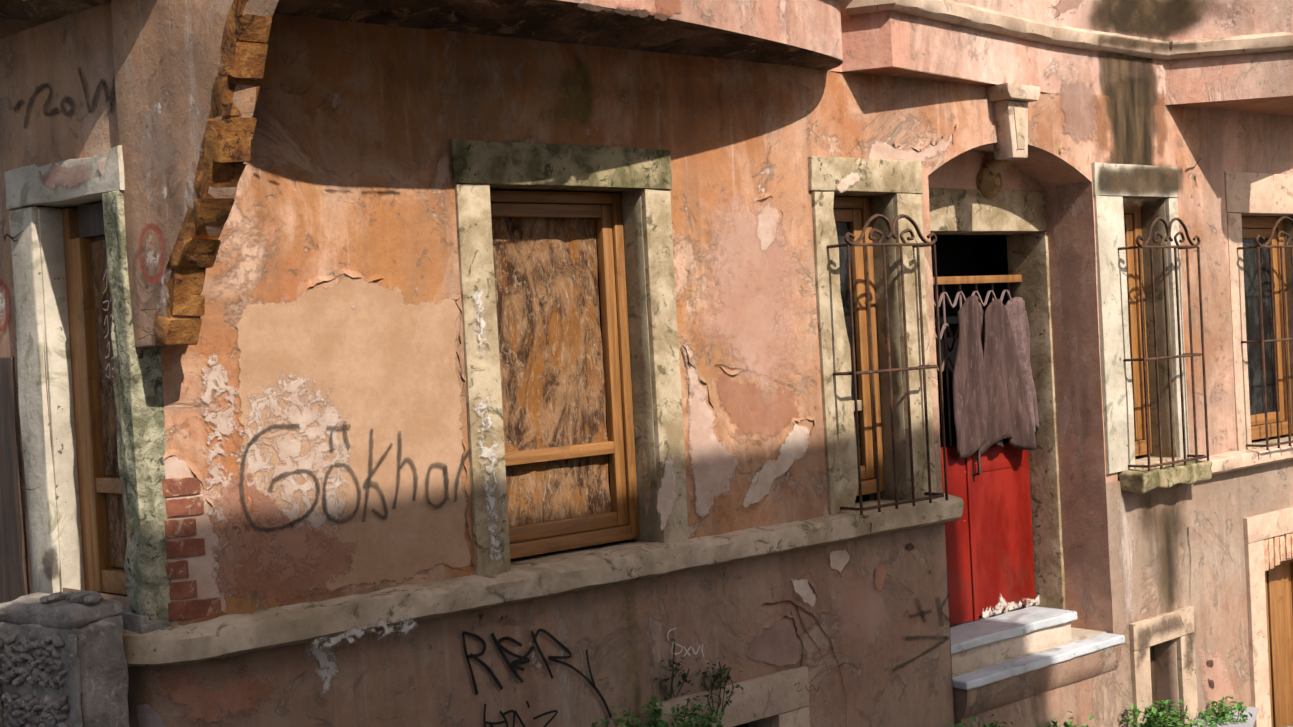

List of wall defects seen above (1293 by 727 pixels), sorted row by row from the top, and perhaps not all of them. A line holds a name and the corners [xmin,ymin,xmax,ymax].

spalling [155,0,272,346]
damp [1061,0,1212,202]
peeling [162,267,476,623]